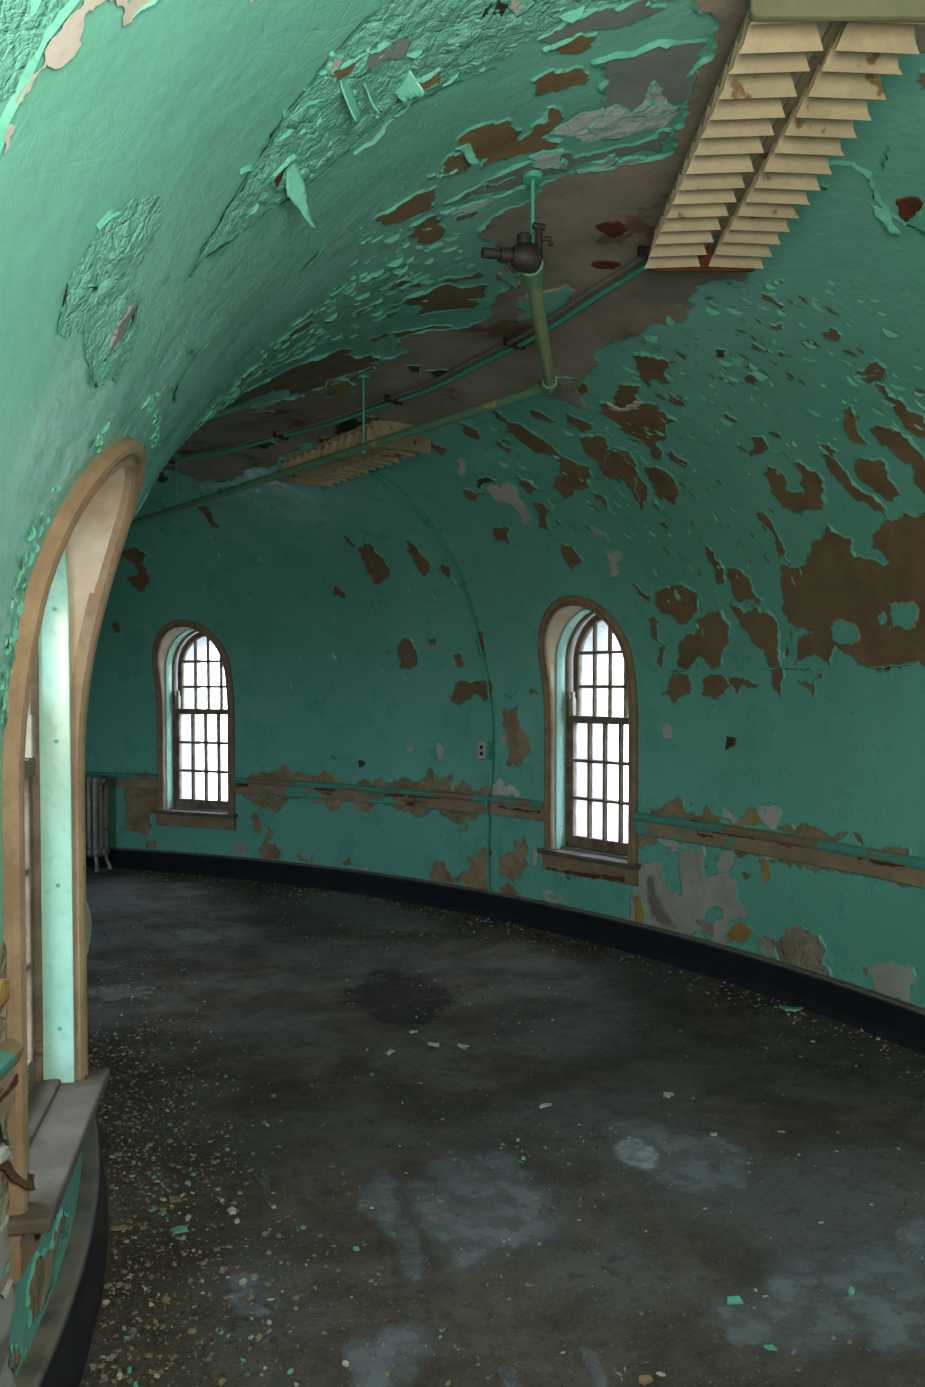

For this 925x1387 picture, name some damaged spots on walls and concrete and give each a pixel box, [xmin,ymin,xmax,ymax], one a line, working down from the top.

peeling [16,0,151,104]
crack [57,8,498,388]
flaking render [135,0,925,704]
peeling [0,485,60,732]
peeling [121,545,152,593]
flaking render [123,770,159,849]
peeling [233,629,539,864]
peeling [429,834,565,905]
flaking render [628,835,912,977]
peeling [650,796,912,856]
flaking render [0,942,10,1044]
flaking render [0,1110,69,1387]